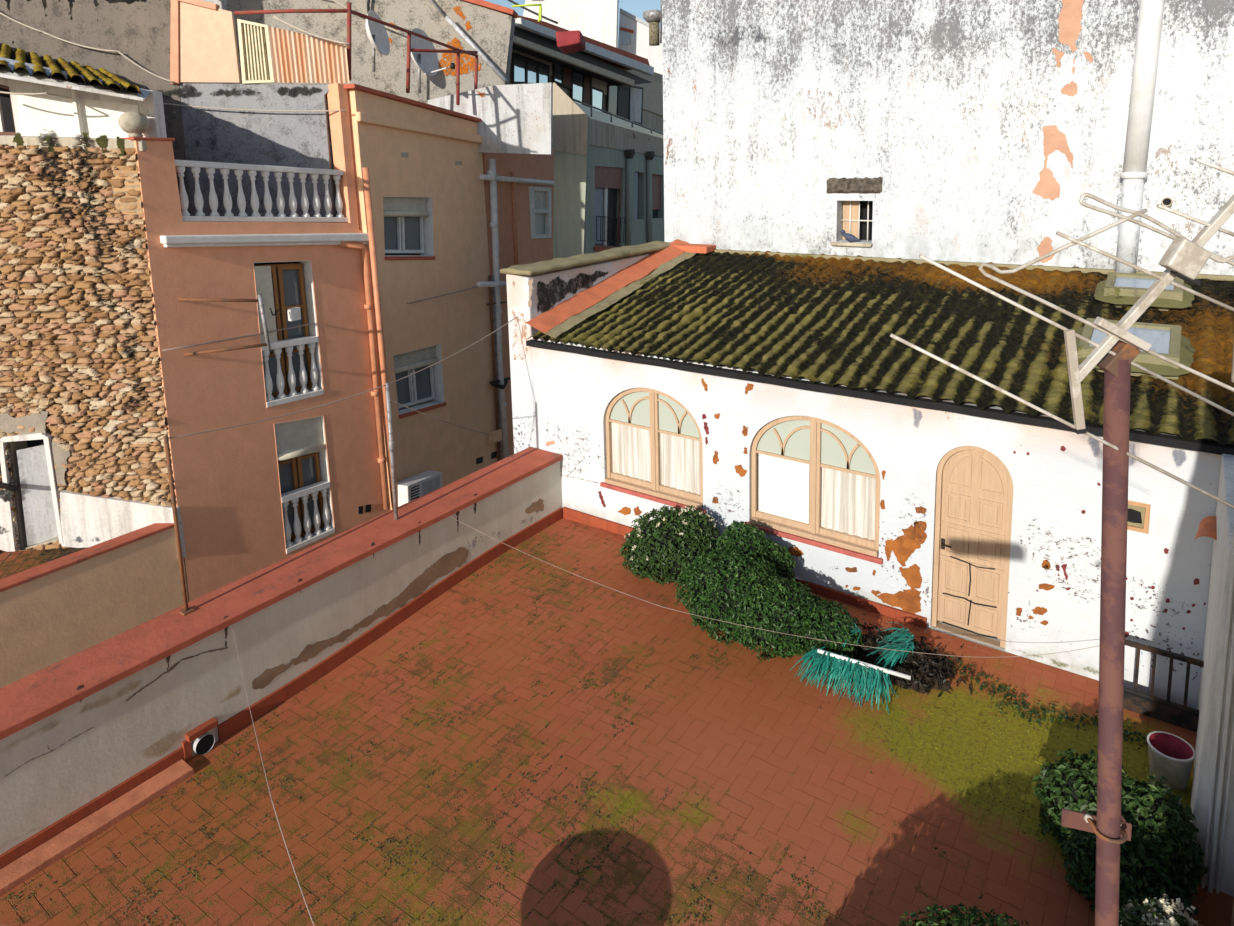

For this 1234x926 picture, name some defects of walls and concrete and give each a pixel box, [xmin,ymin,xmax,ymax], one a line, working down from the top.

peeling [1052,0,1093,97]
water stain [13,131,135,263]
peeling [1022,125,1073,201]
water stain [512,271,608,313]
water stain [95,289,148,412]
water stain [0,455,19,502]
peeling [702,413,720,465]
spalling [712,425,749,514]
peeling [829,495,927,614]
water stain [229,547,468,697]
crack [126,647,228,701]
crack [5,727,94,777]